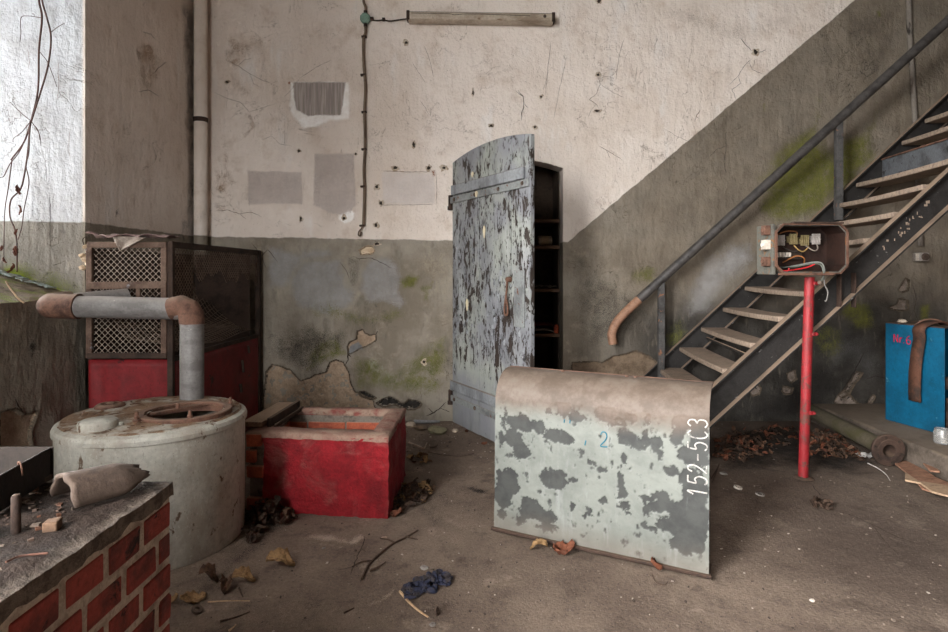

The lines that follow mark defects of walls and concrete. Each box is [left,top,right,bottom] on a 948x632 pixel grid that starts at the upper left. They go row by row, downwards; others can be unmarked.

spalling [246,329,423,519]
spalling [571,350,657,376]